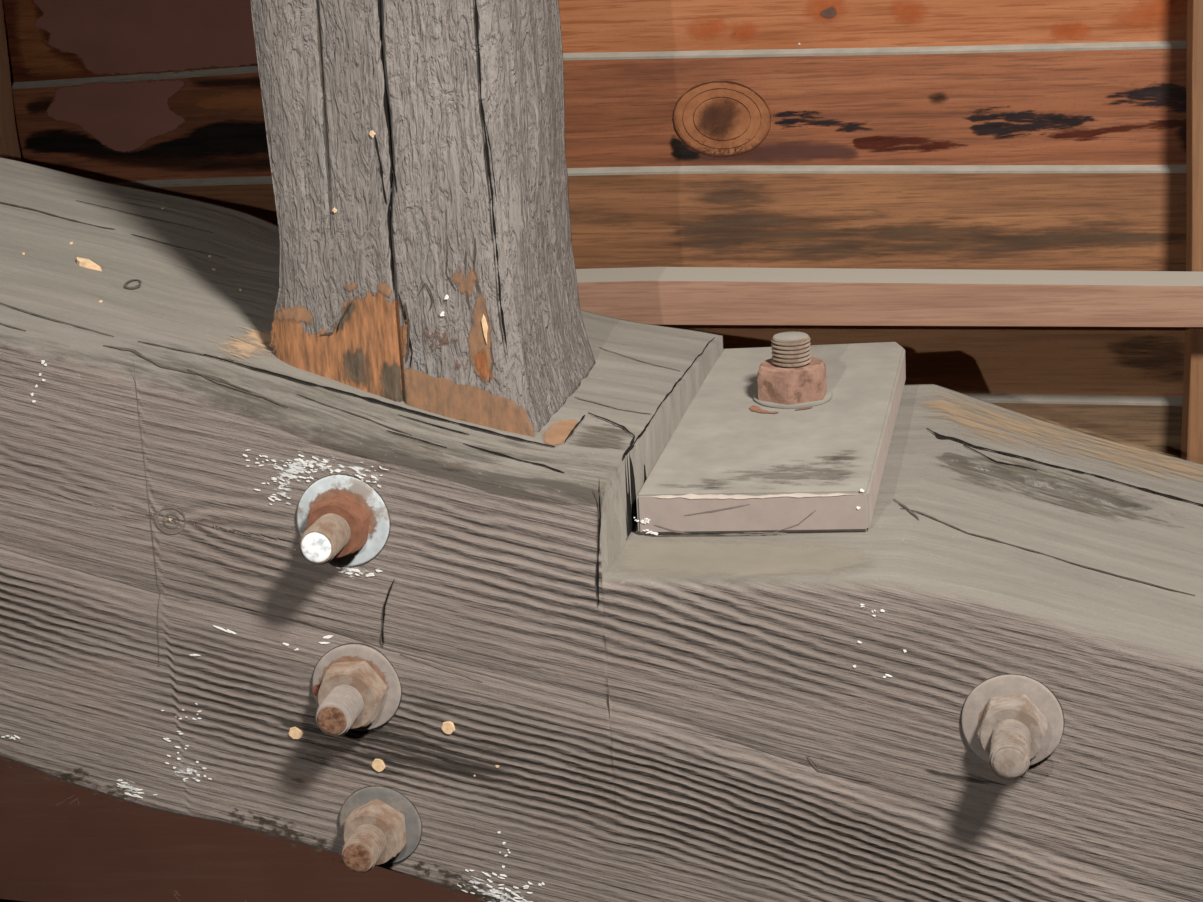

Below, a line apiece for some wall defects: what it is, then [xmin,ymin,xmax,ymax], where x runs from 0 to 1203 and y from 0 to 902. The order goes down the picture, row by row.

water stain [196,78,260,86]
water stain [25,120,270,170]
water stain [693,83,1186,161]
peeling [269,270,577,445]
corrosion [310,488,377,538]
corrosion [313,656,386,696]
crack [247,578,869,781]